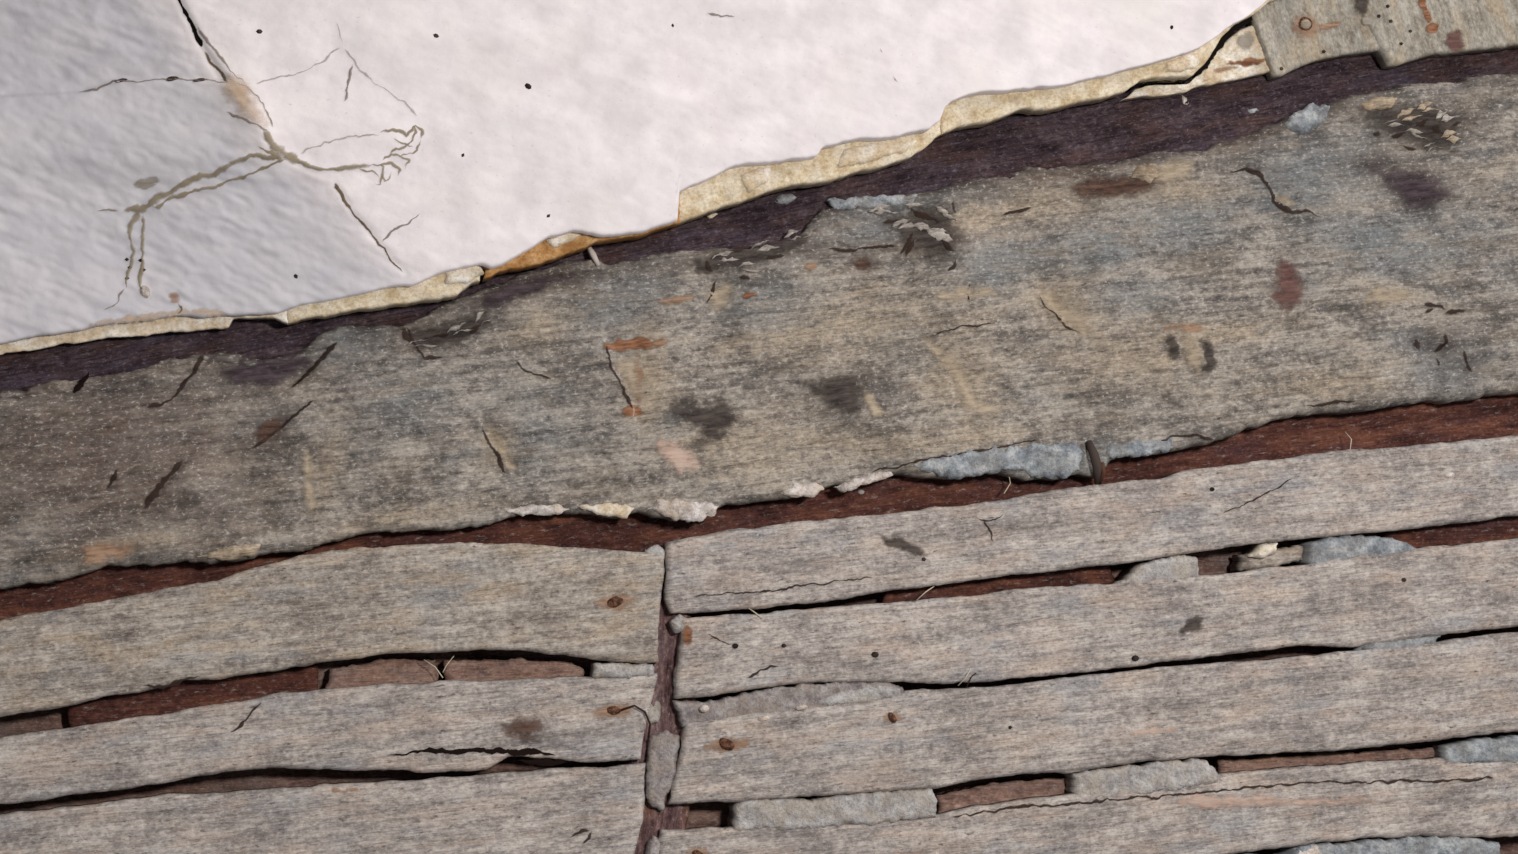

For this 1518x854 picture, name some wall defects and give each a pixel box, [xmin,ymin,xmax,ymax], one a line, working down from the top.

crack [1132,16,1253,90]
corrosion [1419,0,1464,51]
crack [81,0,424,309]
flaking render [0,0,1276,355]
spalling [293,342,337,387]
corrosion [604,337,668,416]
crack [391,747,566,766]